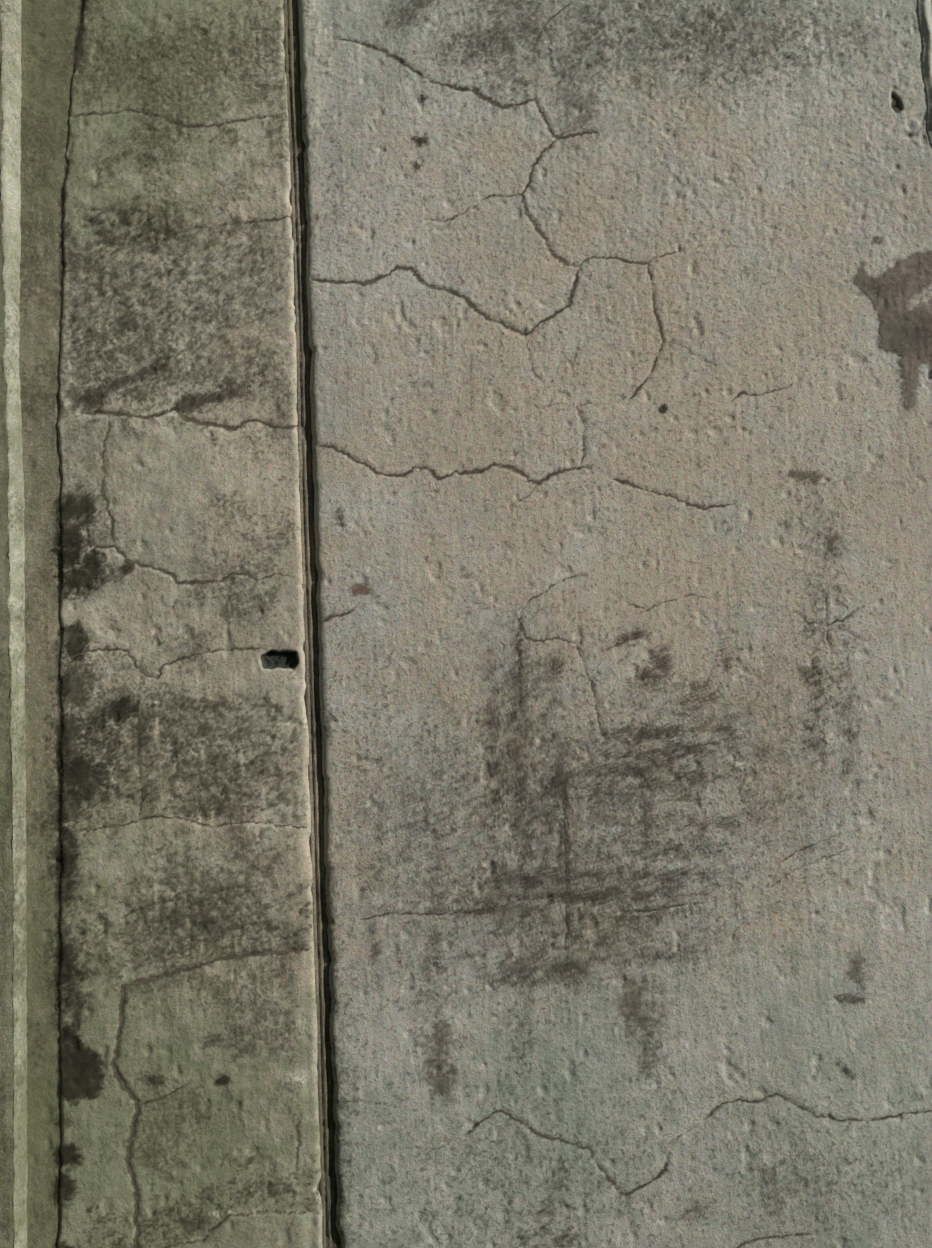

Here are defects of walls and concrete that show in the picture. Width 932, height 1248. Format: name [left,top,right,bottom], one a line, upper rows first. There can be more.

crack [59,0,737,609]
water stain [851,250,932,409]
mould [51,483,145,601]
crack [81,646,307,832]
crack [323,596,378,623]
crack [516,575,620,732]
water stain [42,619,312,1127]
water stain [344,604,847,1073]
water stain [52,1143,322,1248]
crack [111,886,309,1248]
water stain [415,1020,463,1106]
crack [400,1053,932,1227]